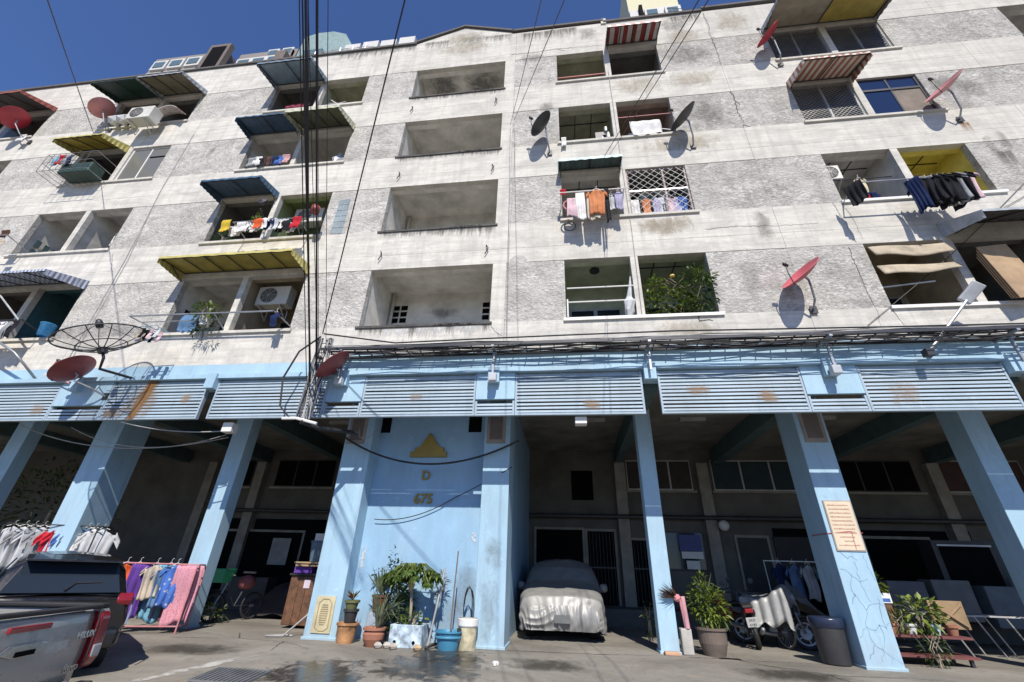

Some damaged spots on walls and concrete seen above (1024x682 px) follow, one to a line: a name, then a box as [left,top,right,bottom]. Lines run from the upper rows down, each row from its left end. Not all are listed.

rust [127,381,159,419]
crack [740,552,953,682]